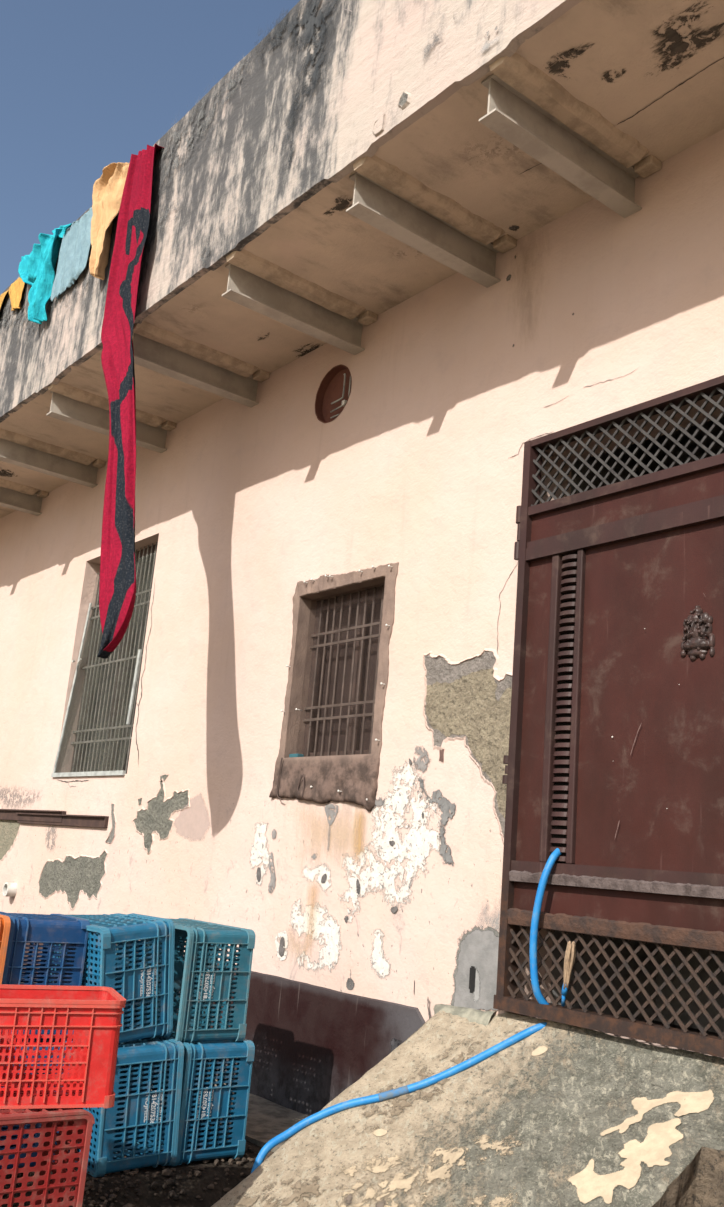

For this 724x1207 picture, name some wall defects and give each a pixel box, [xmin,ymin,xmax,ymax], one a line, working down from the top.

leakage [261,0,335,130]
leakage [0,293,35,344]
spalling [0,806,21,863]
spalling [38,803,117,911]
spalling [133,774,191,855]
spalling [275,648,512,972]
peeling [370,929,391,980]
peeling [568,1089,715,1204]